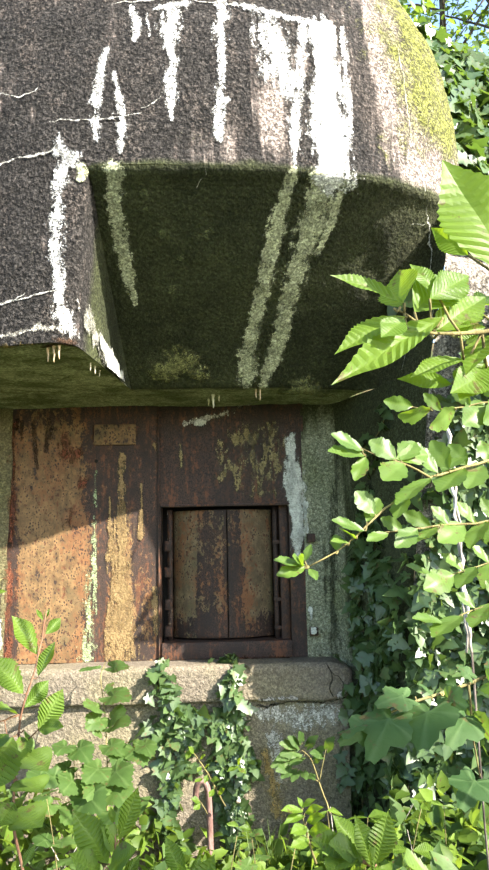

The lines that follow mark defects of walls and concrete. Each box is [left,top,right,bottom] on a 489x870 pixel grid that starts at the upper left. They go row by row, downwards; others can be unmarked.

crack [0,148,84,166]
efflorescence [29,132,88,338]
crack [50,96,161,122]
efflorescence [89,47,138,306]
efflorescence [129,0,191,121]
efflorescence [210,0,365,406]
corrosion [6,418,83,544]
efflorescence [183,410,229,426]
peeling [215,421,286,498]
efflorescence [283,433,309,557]
corrosion [4,557,19,658]